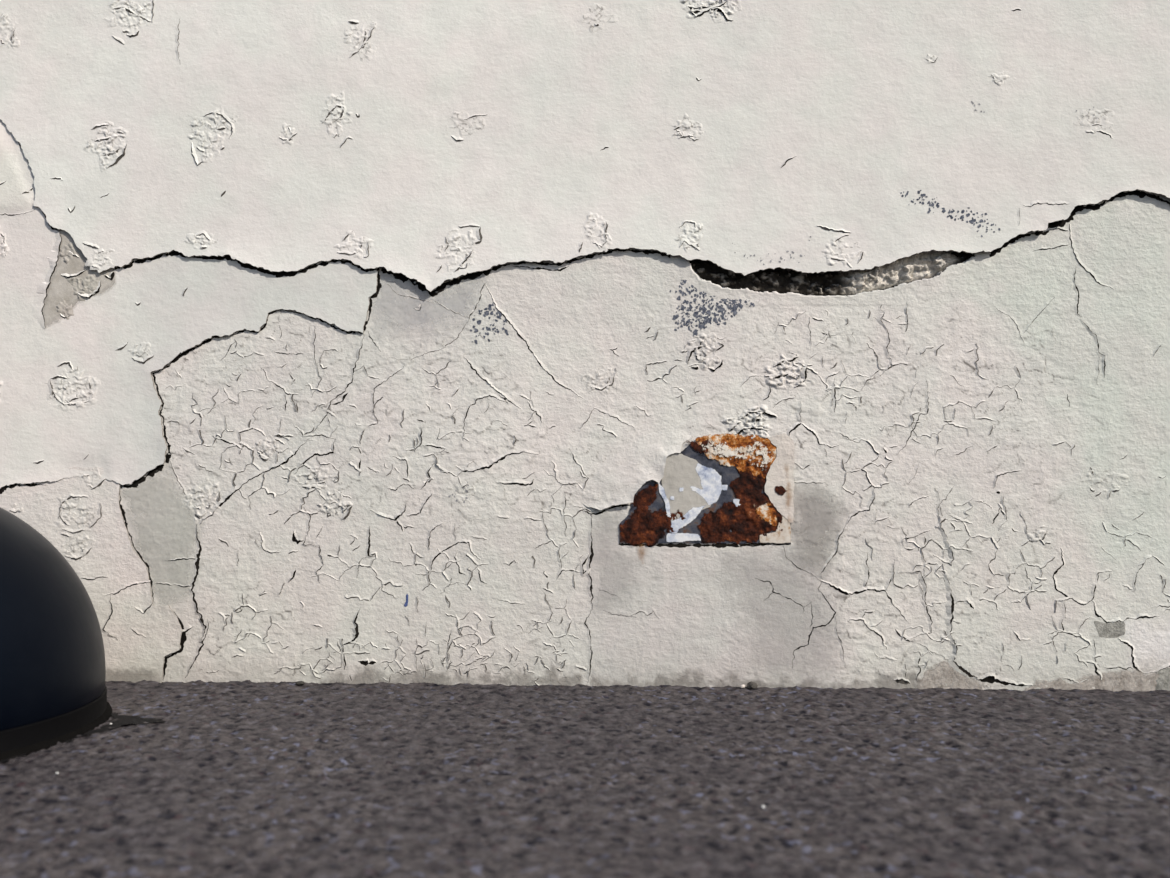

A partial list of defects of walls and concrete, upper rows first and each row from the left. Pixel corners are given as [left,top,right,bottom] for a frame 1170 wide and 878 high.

peeling [187,106,239,166]
peeling [432,223,483,276]
spalling [675,220,966,295]
peeling [684,332,724,372]
crack [0,483,46,494]
peeling [0,120,378,683]
crack [80,190,1170,686]
peeling [580,427,692,510]
rust [619,433,789,546]
peeling [720,403,794,523]
spalling [1094,621,1125,638]
spalling [1025,668,1170,692]